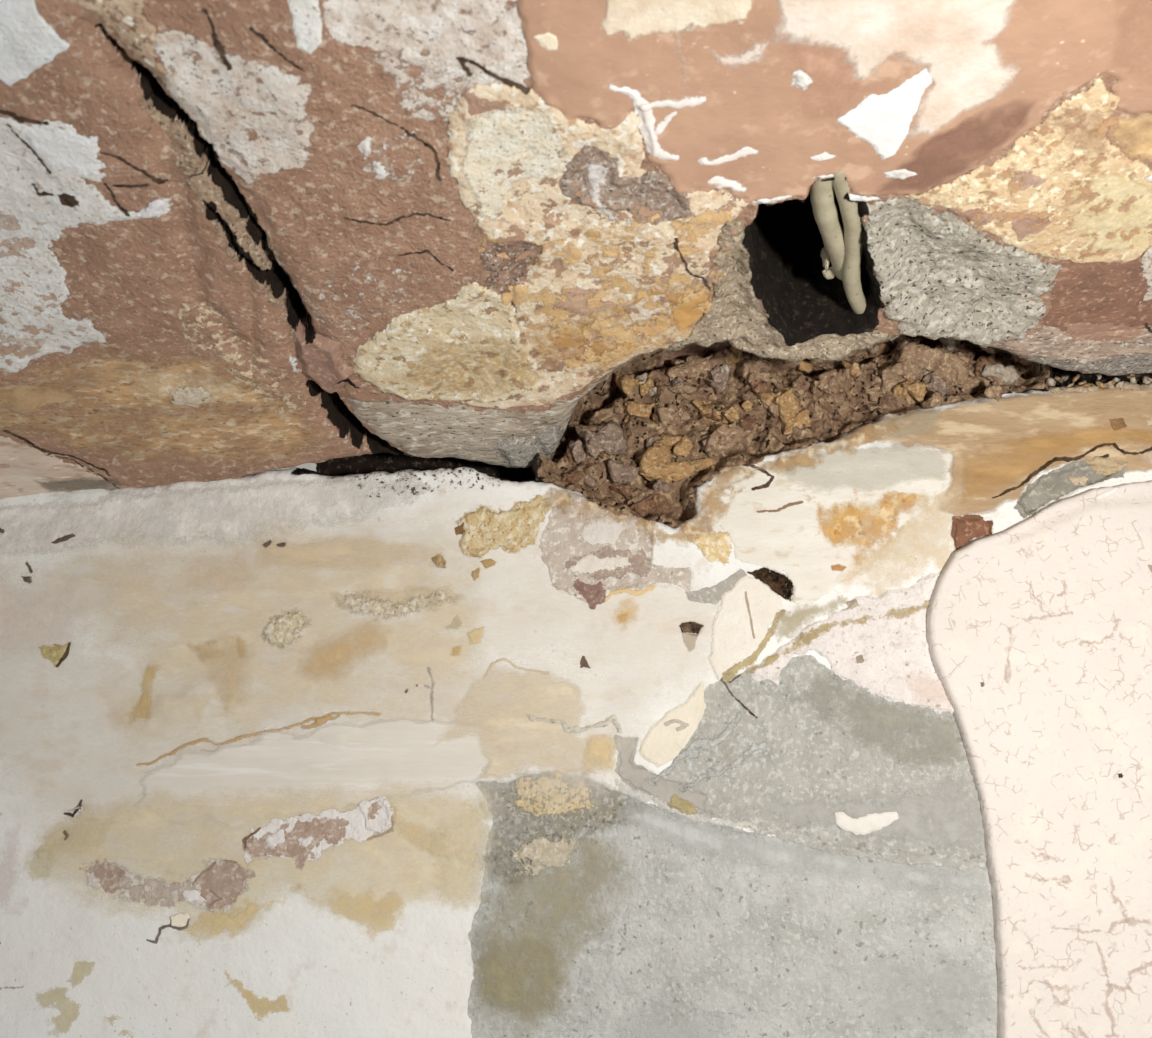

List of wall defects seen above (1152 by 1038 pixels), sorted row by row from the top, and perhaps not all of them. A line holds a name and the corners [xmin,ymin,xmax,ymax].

crack [202,9,232,70]
crack [456,57,530,95]
peeling [19,124,106,178]
peeling [884,169,918,179]
peeling [103,197,173,222]
crack [292,378,574,483]
spalling [455,194,1152,609]
crack [992,443,1152,498]
crack [137,712,381,766]
leakage [0,531,705,935]
peeling [79,796,394,944]
spalling [468,655,998,1038]